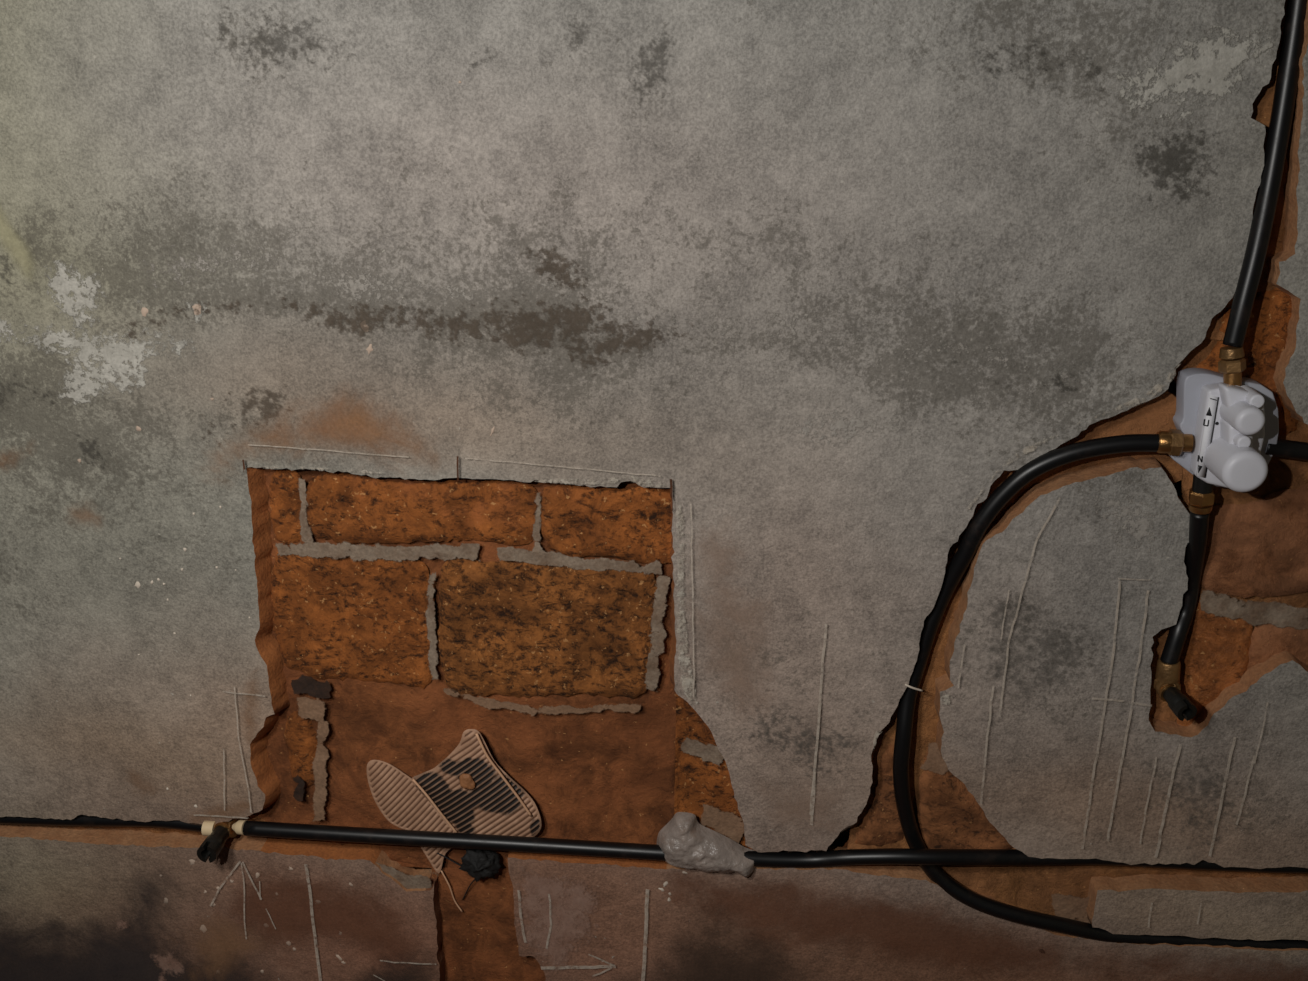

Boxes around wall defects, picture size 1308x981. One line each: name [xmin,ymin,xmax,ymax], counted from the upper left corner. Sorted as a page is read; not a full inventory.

flaking render [1116,0,1308,442]
leakage [0,260,251,405]
leakage [282,249,683,375]
spalling [934,456,1193,756]
flaking render [1149,457,1308,737]
leakage [194,687,265,819]
flaking render [224,467,753,981]
spalling [0,824,207,848]
spalling [755,846,940,887]
leakage [0,890,248,981]
leakage [541,954,616,976]
leakage [641,889,649,981]